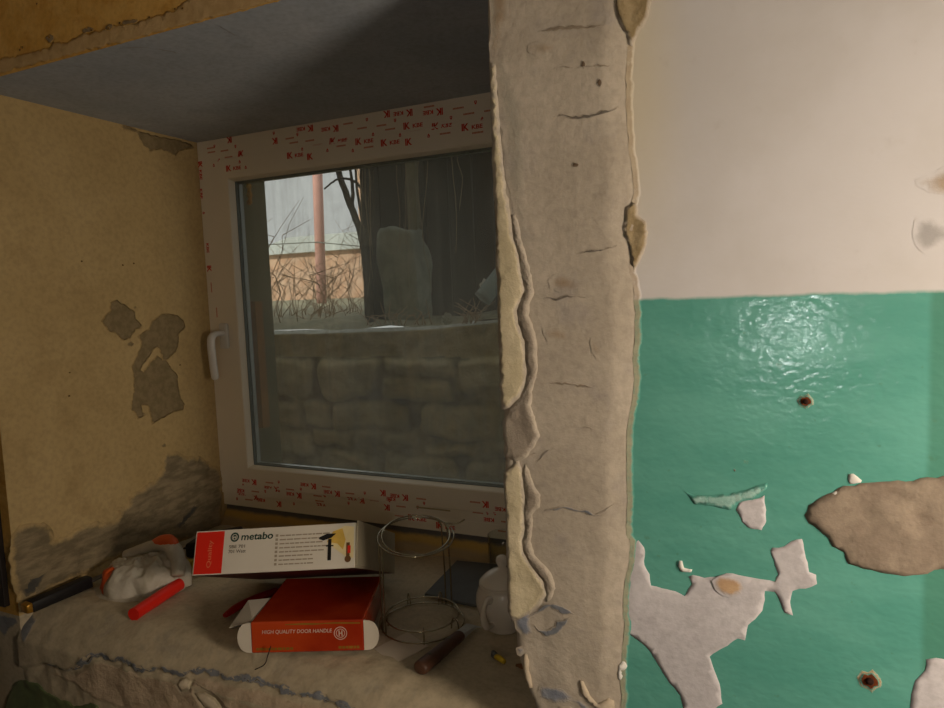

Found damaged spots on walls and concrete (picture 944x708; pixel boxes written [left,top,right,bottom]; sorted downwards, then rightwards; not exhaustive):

crack [539,24,606,32]
flaking render [623,202,648,272]
flaking render [101,300,185,424]
crack [542,42,643,708]
rust [796,392,815,411]
flaking render [8,443,223,602]
peeling [684,483,767,530]
flaking render [805,474,944,576]
peeling [628,539,817,708]
crack [47,652,356,708]
rust [856,669,883,694]
peeling [910,658,944,708]